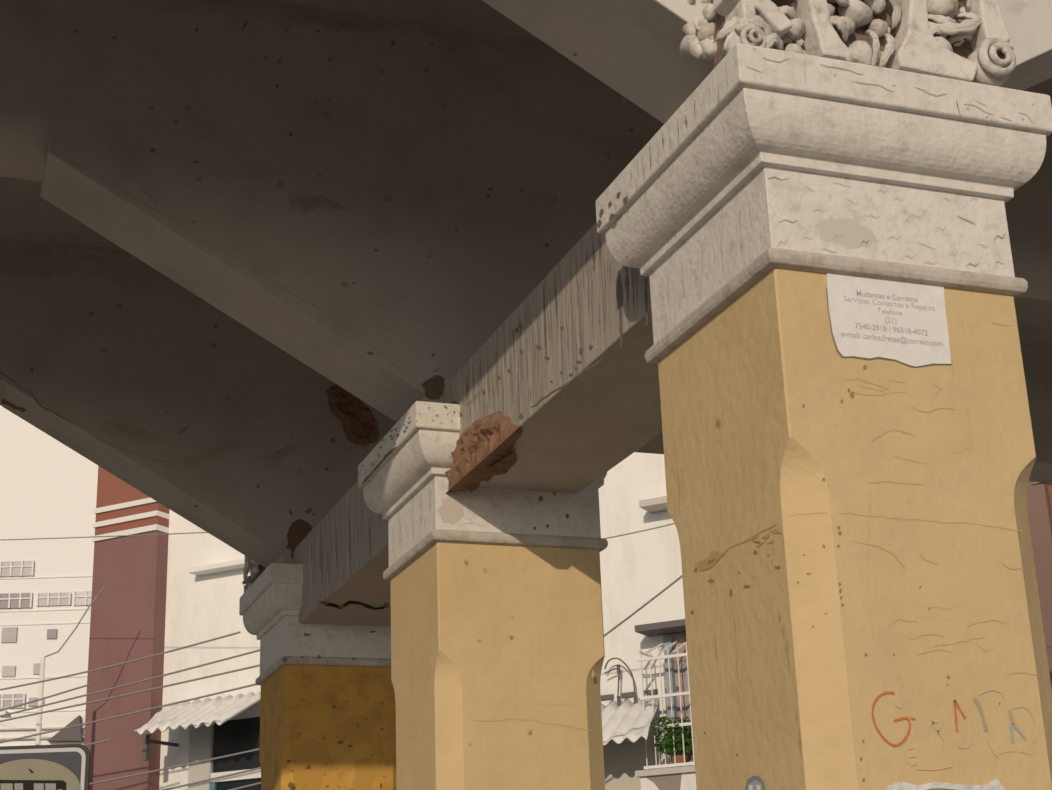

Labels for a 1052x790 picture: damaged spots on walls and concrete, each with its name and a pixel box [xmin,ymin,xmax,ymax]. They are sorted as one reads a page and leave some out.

spalling [326,384,379,446]
spalling [445,411,523,493]
crack [845,359,968,485]
crack [721,512,1023,554]
crack [325,601,385,610]
crack [890,606,1005,655]